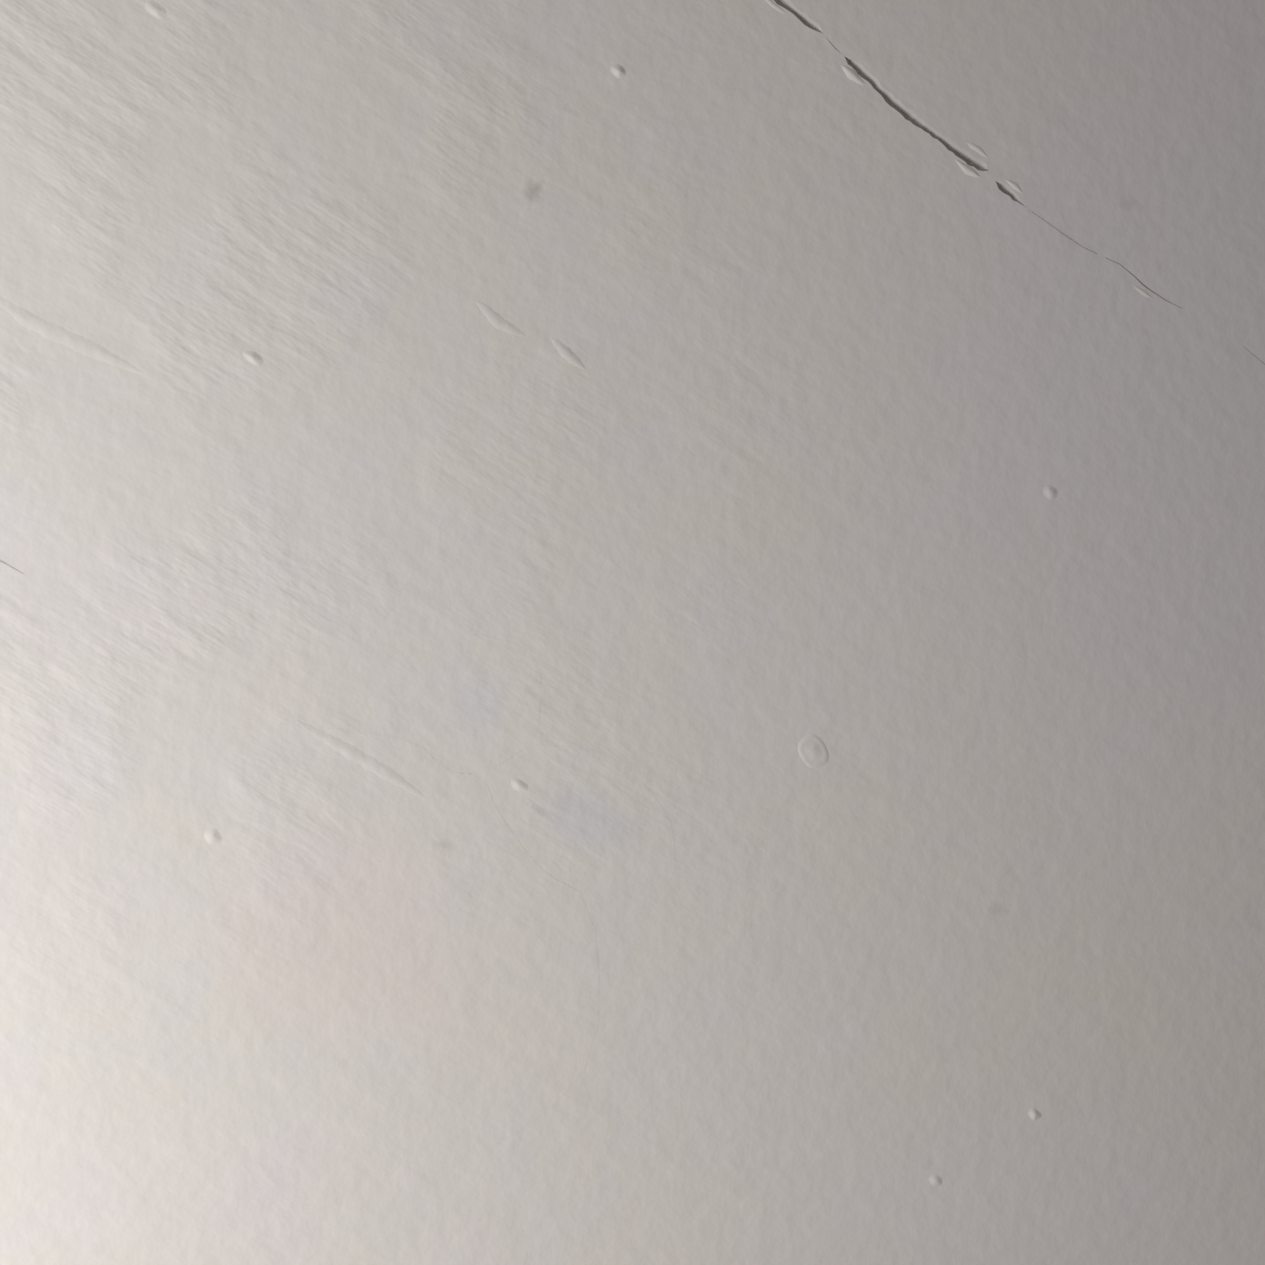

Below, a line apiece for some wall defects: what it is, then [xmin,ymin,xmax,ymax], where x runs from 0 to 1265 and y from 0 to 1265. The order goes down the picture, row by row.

crack [765,0,1181,308]